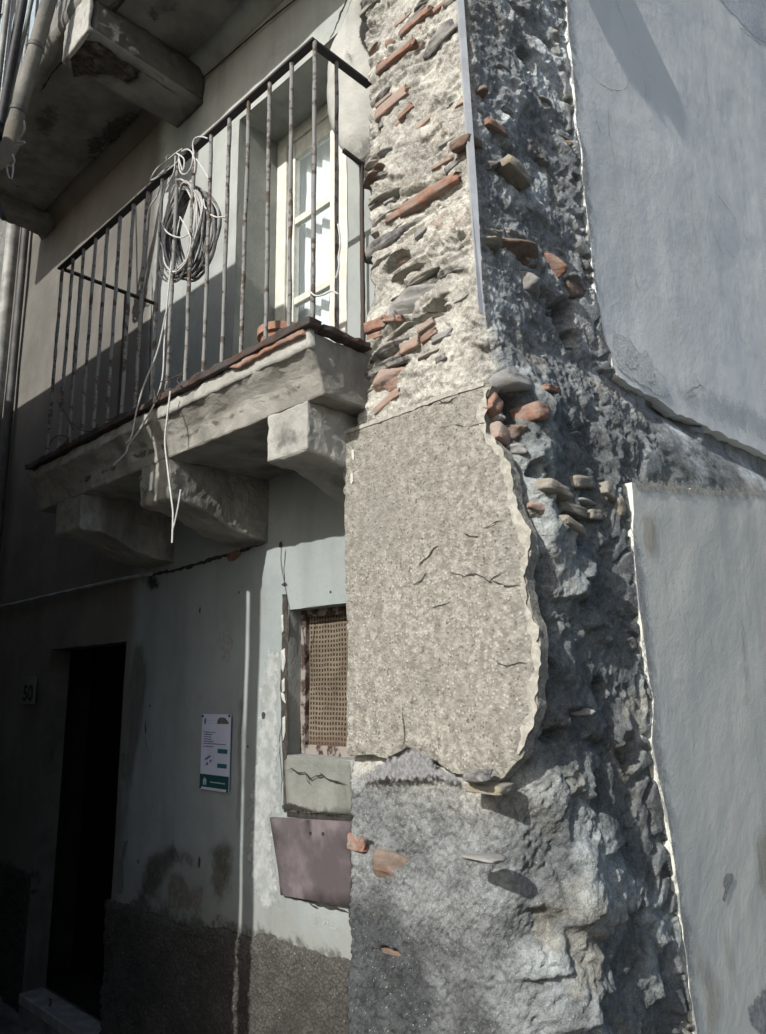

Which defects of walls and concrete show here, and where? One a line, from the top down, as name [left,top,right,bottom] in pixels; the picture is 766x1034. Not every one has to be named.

spalling [347,0,766,1034]
crack [413,546,437,585]
crack [454,573,516,587]
crack [279,729,344,785]
water stain [130,846,339,960]